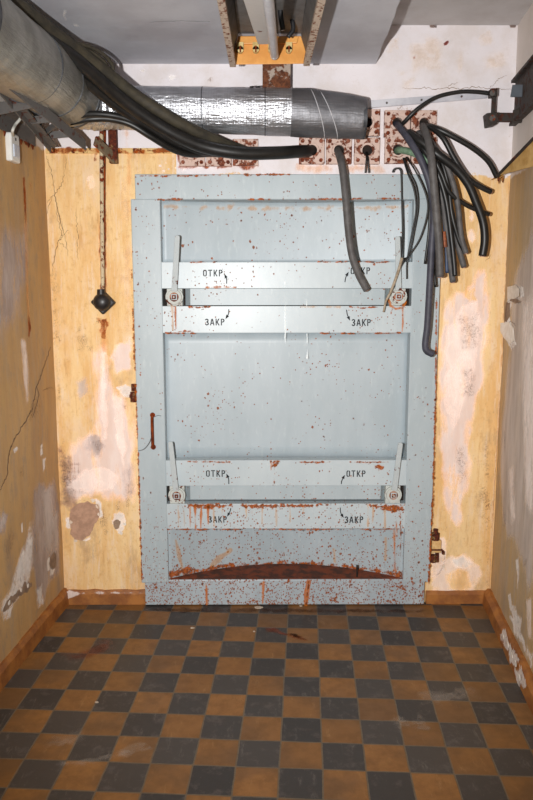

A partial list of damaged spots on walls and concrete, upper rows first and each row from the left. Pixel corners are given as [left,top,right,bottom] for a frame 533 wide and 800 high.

crack [46,156,79,271]
crack [0,347,51,490]
leakage [90,436,103,454]
corrosion [162,300,437,604]
spalling [66,498,103,542]
spalling [113,508,126,535]
spalling [3,581,32,616]
peeling [502,594,532,688]